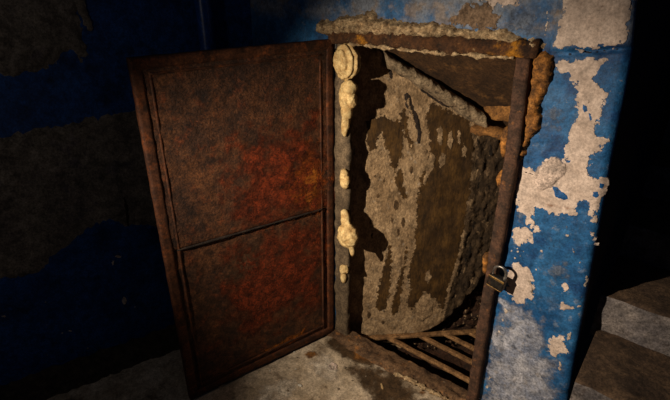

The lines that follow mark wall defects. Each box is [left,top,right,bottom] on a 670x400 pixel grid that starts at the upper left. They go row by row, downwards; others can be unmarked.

corrosion [233,130,327,223]
damp [365,108,414,199]
damp [375,100,474,321]
peeling [480,0,632,400]